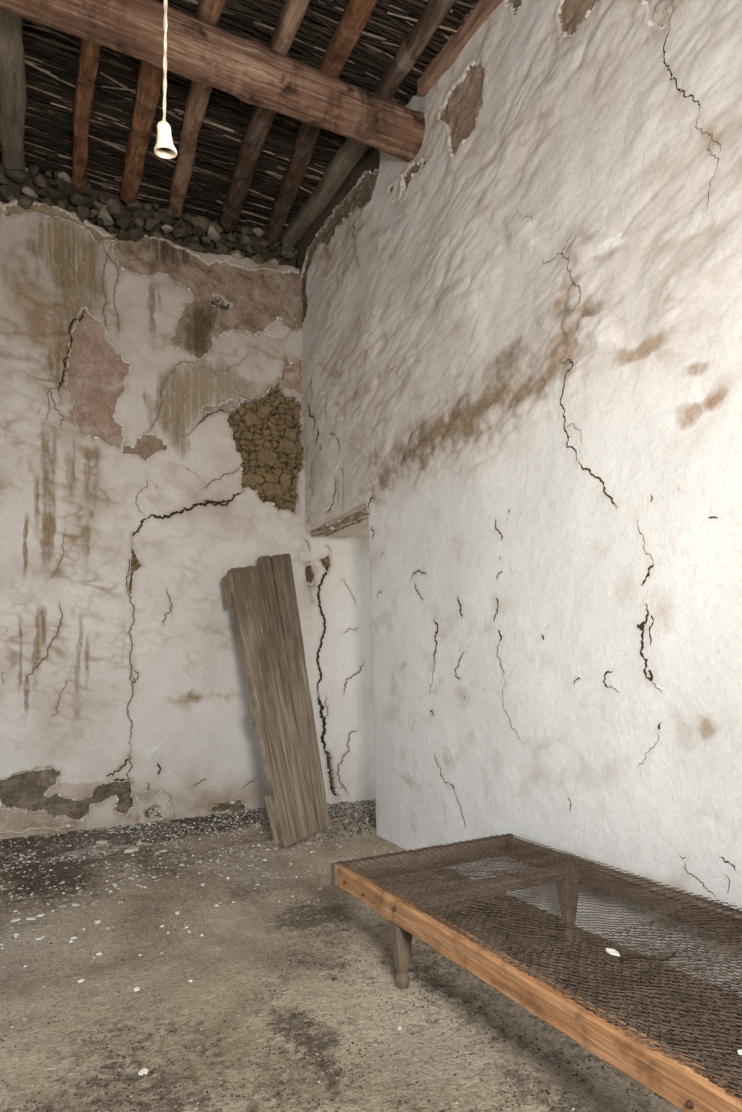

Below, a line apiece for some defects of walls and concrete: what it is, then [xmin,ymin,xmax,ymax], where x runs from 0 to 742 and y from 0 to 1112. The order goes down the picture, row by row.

spalling [557,0,603,38]
spalling [437,59,485,159]
crack [663,22,721,215]
spalling [0,157,426,537]
leakage [622,339,660,361]
leakage [23,433,56,566]
leakage [403,377,505,460]
crack [543,225,679,693]
leakage [35,615,46,660]
crack [92,468,243,807]
crack [305,540,382,796]
spalling [0,762,173,833]